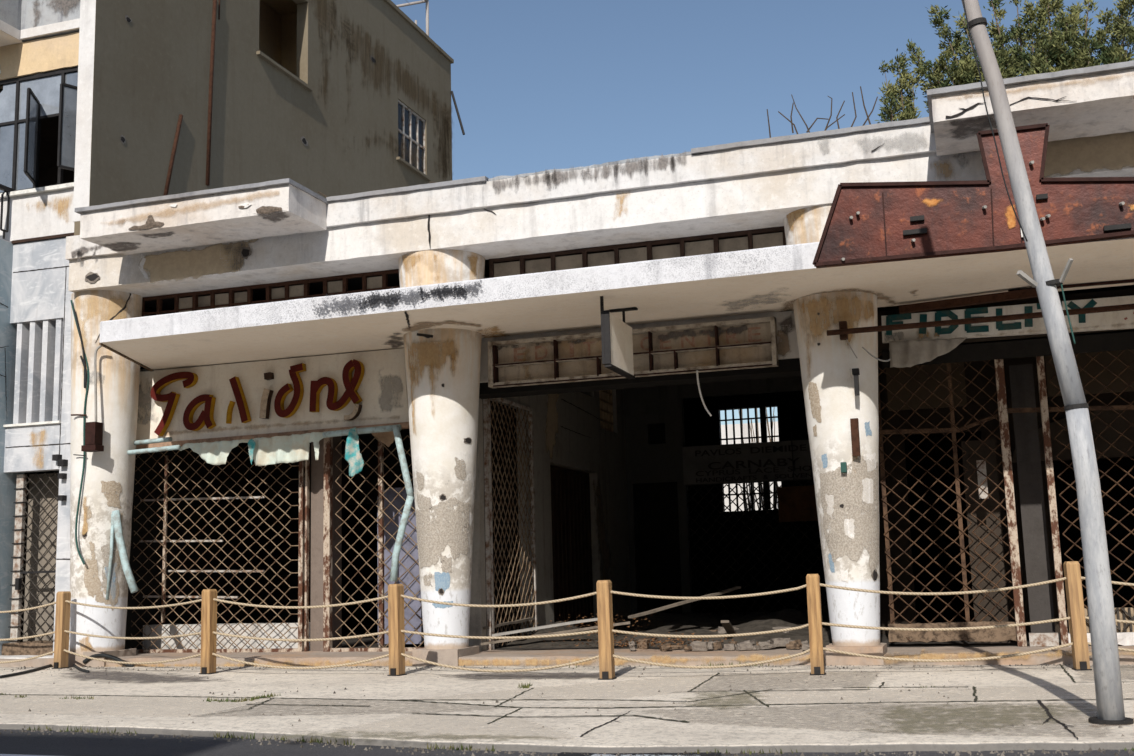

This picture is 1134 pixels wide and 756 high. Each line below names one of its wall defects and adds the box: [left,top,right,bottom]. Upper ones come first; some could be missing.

water stain [318,0,452,176]
water stain [493,154,685,191]
water stain [360,291,400,310]
peeling [808,382,822,436]
peeling [454,457,466,480]
peeling [101,481,122,524]
peeling [416,471,469,587]
peeling [820,452,879,583]
peeling [84,542,120,610]